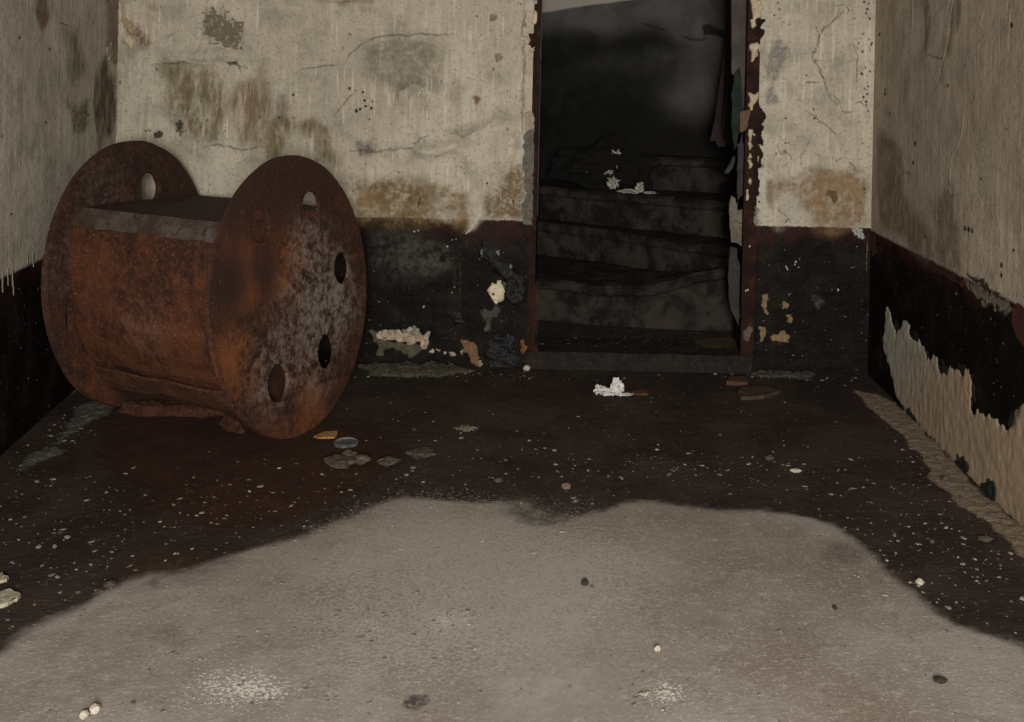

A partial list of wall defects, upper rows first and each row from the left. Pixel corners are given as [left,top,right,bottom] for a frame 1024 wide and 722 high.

damp [200,7,244,66]
damp [168,66,267,139]
damp [267,103,331,160]
peeling [740,0,790,225]
damp [769,170,878,272]
flaking render [369,325,483,367]
flaking render [487,280,506,304]
flaking render [743,294,793,343]
peeling [882,306,1024,526]
damp [0,360,1024,651]
damp [167,654,310,716]